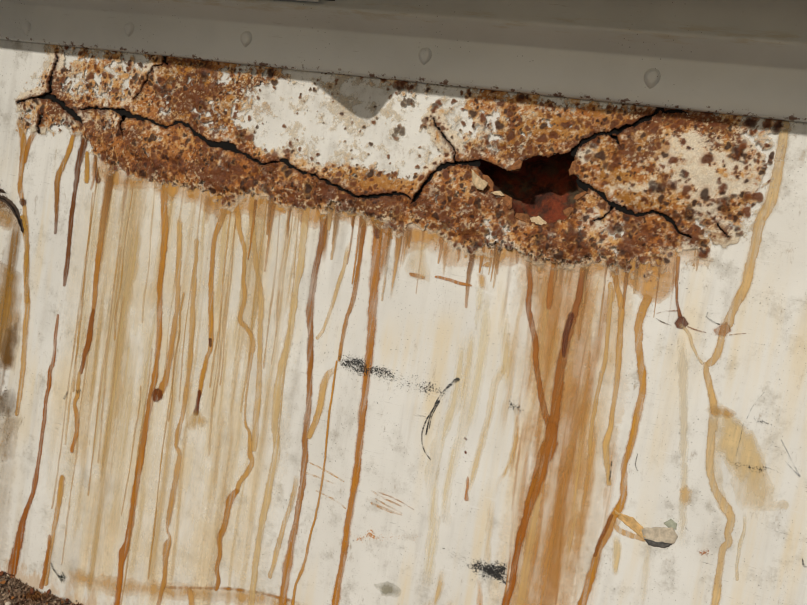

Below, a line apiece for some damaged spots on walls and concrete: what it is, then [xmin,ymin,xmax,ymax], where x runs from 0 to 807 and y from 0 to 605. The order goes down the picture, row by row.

crack [17,54,481,202]
crack [571,107,687,157]
crack [0,189,24,233]
spalling [479,151,584,226]
crack [576,178,692,238]
corrosion [0,97,730,605]
corrosion [700,121,790,605]